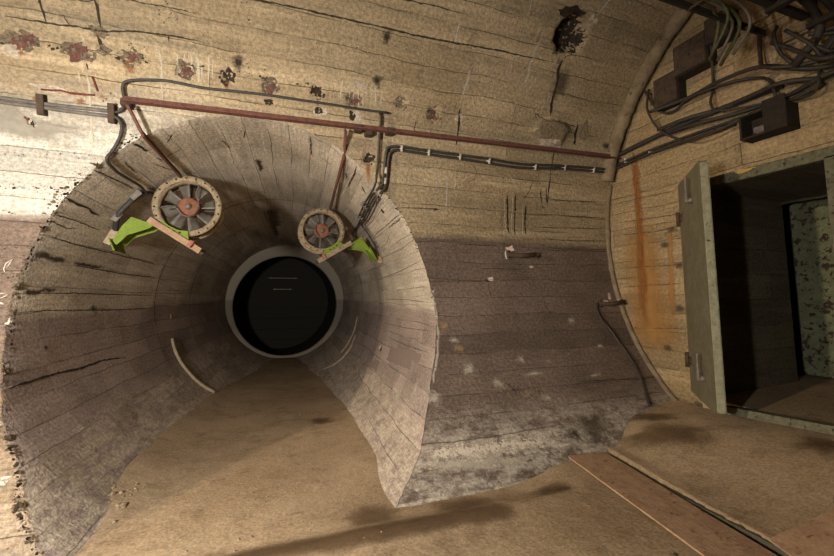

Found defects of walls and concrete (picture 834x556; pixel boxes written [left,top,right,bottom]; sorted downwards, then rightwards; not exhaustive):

crack [255,0,586,116]
spalling [552,5,598,64]
crack [454,109,463,145]
crack [573,118,589,144]
crack [92,135,180,190]
crack [310,139,428,303]
crack [522,152,676,252]
corrosion [632,155,668,343]
spalling [0,162,102,555]
damp [433,435,550,471]
damp [539,485,567,494]
damp [233,499,510,556]